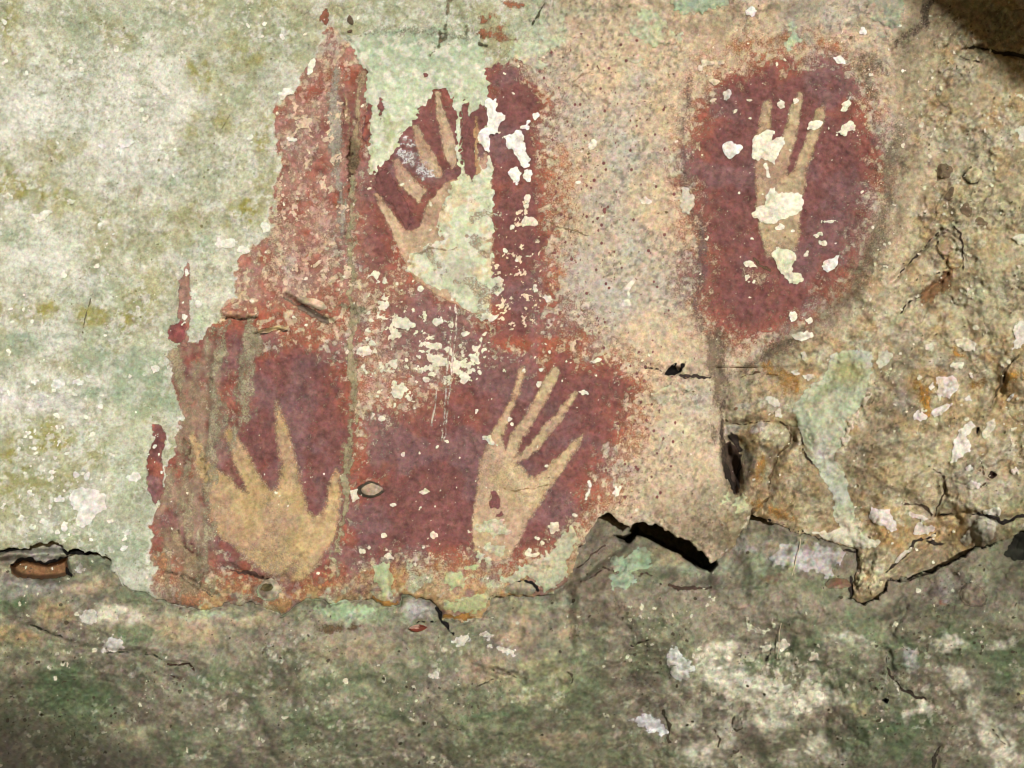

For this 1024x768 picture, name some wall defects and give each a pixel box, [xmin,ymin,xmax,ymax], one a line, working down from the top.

peeling [698,59,732,103]
peeling [807,120,823,130]
peeling [722,129,804,232]
peeling [813,220,838,246]
spalling [345,97,552,423]
peeling [771,248,809,284]
peeling [822,255,839,272]
peeling [621,280,636,307]
crack [886,469,1024,583]
crack [0,548,125,586]
crack [577,545,712,591]